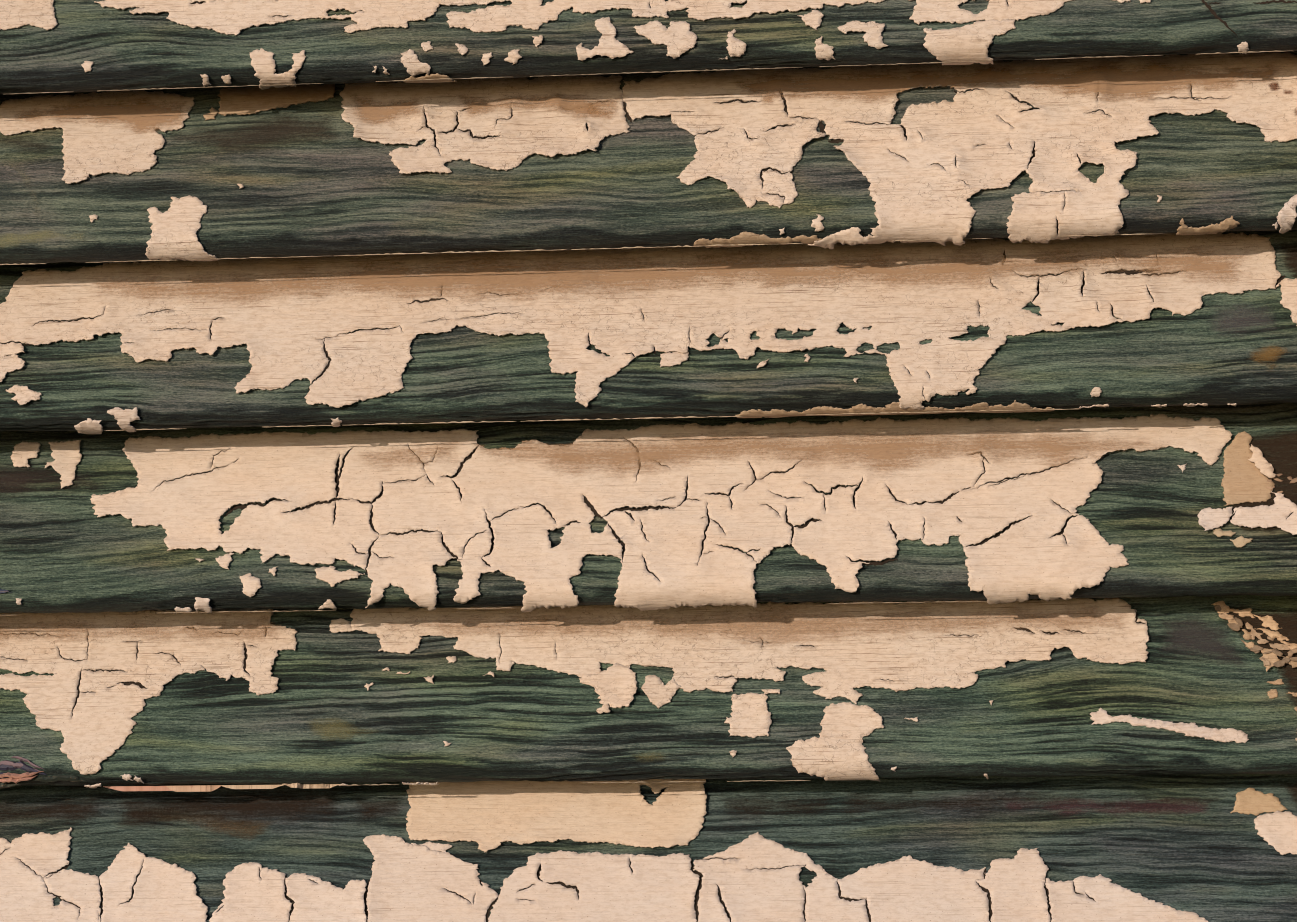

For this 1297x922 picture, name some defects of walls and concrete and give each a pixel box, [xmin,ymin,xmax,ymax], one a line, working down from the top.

peeling [0,0,1297,418]
crack [1031,255,1181,323]
peeling [45,440,82,489]
crack [224,439,1068,581]
peeling [90,414,1297,781]
peeling [0,589,298,788]
crack [0,849,143,917]
crack [444,865,579,922]
peeling [0,779,1208,922]
crack [690,858,806,922]
crack [976,869,993,922]
peeling [1230,788,1297,855]